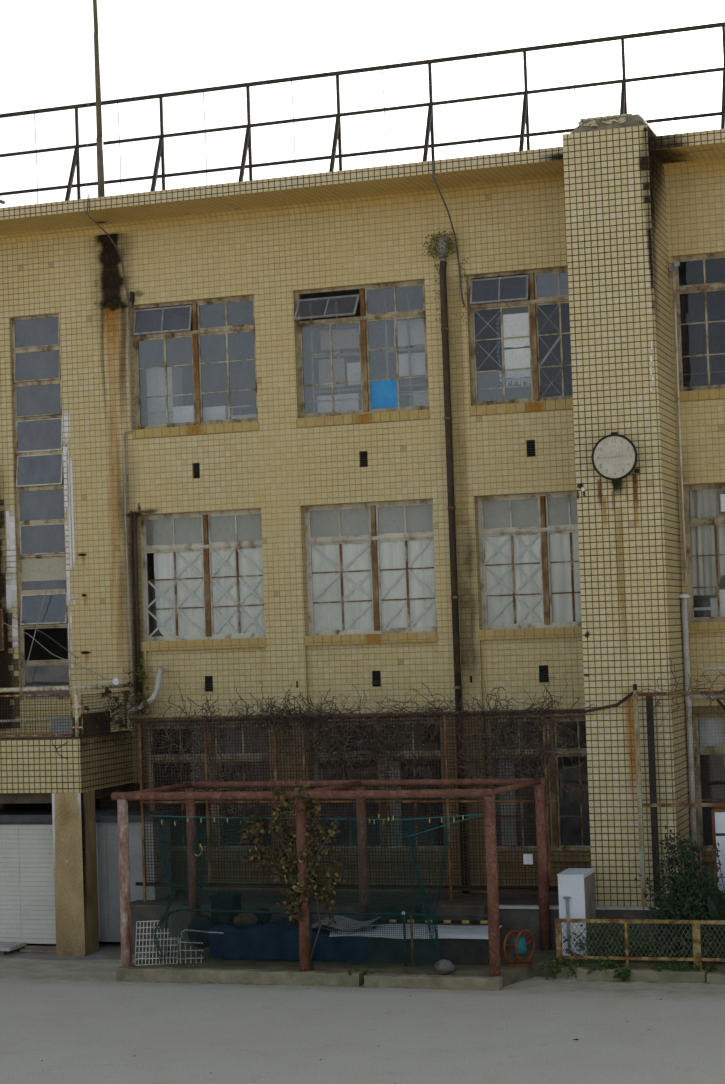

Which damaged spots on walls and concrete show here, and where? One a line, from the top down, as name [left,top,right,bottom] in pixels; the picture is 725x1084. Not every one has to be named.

water stain [640,125,684,288]
water stain [97,222,127,381]
corrosion [598,475,638,512]
water stain [0,499,20,729]